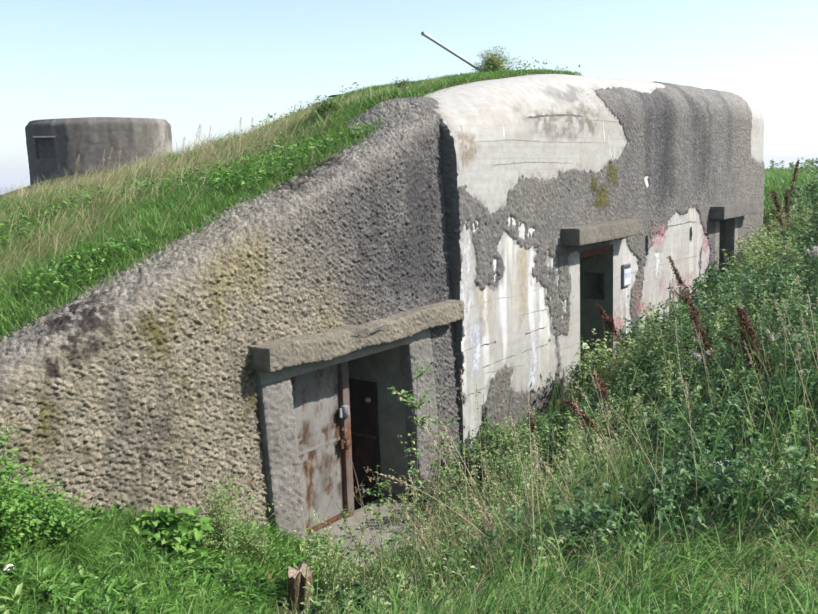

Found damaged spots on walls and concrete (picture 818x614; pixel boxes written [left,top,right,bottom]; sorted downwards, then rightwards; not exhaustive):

peeling [424,74,665,214]
peeling [459,216,580,467]
peeling [610,207,710,358]
corrosion [298,424,314,476]